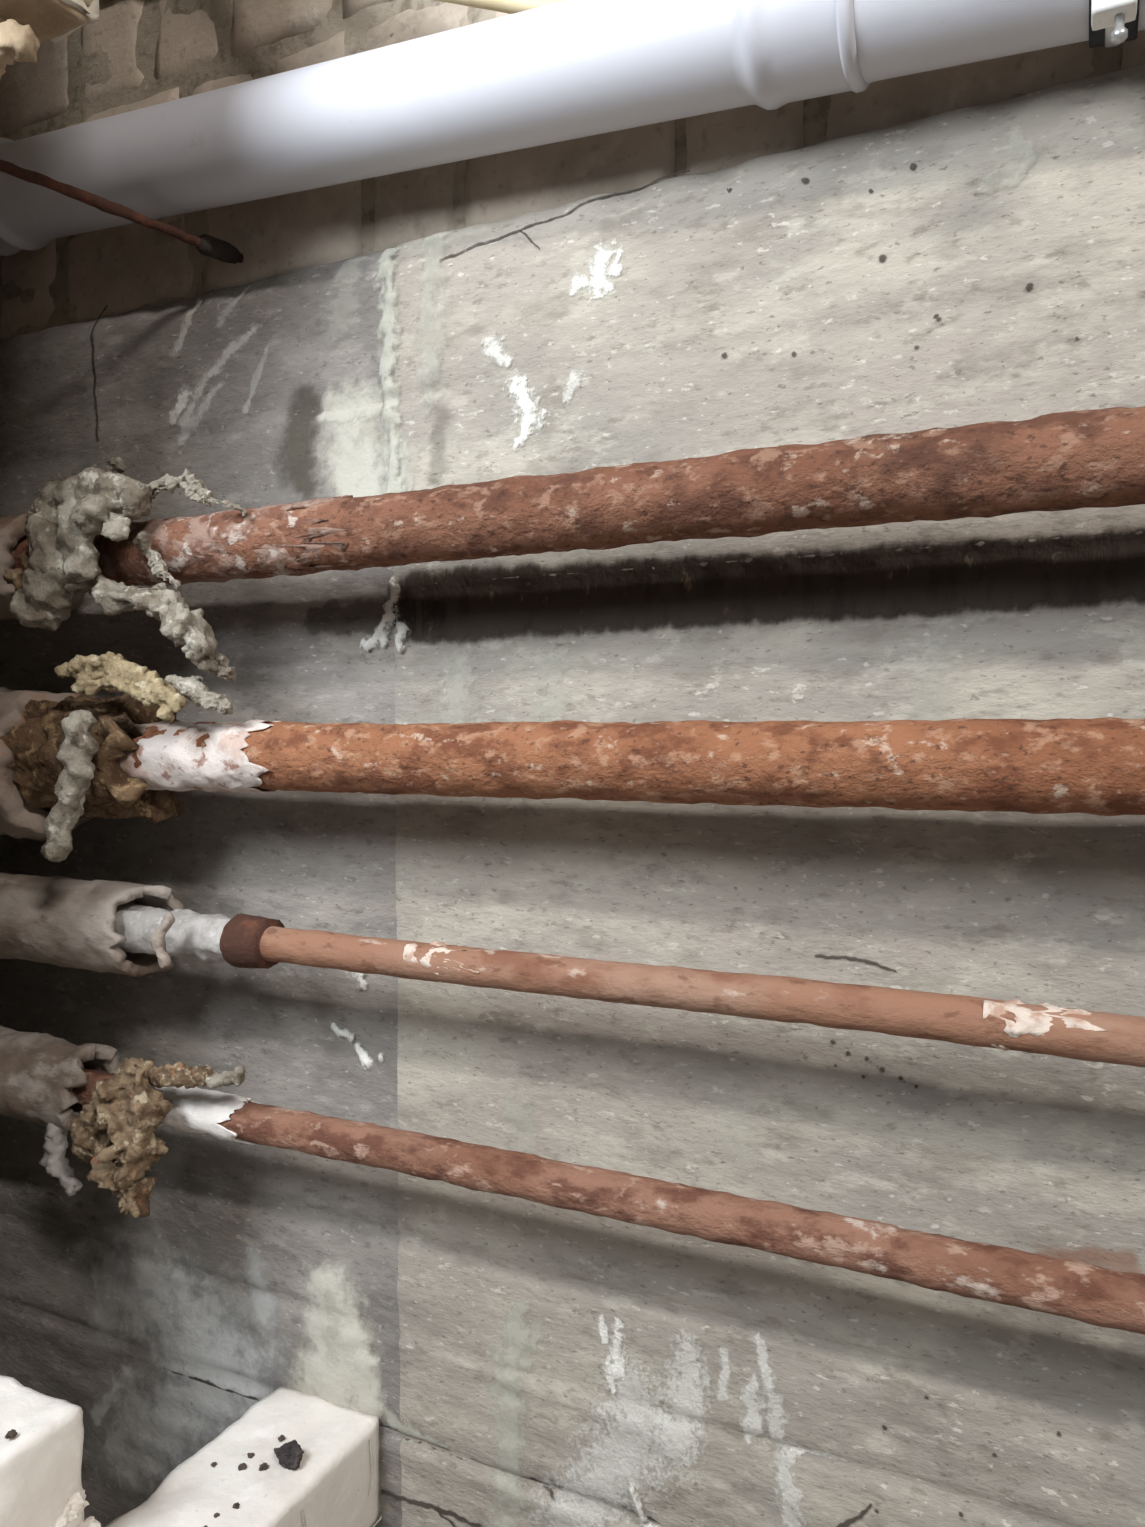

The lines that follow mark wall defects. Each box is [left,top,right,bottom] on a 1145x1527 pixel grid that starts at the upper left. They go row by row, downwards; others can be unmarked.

leakage [569,241,623,299]
leakage [171,298,202,355]
leakage [168,327,255,427]
leakage [484,337,547,450]
leakage [563,373,581,402]
leakage [283,388,319,495]
leakage [488,1302,848,1527]
crack [381,1489,485,1527]
crack [837,1503,872,1527]